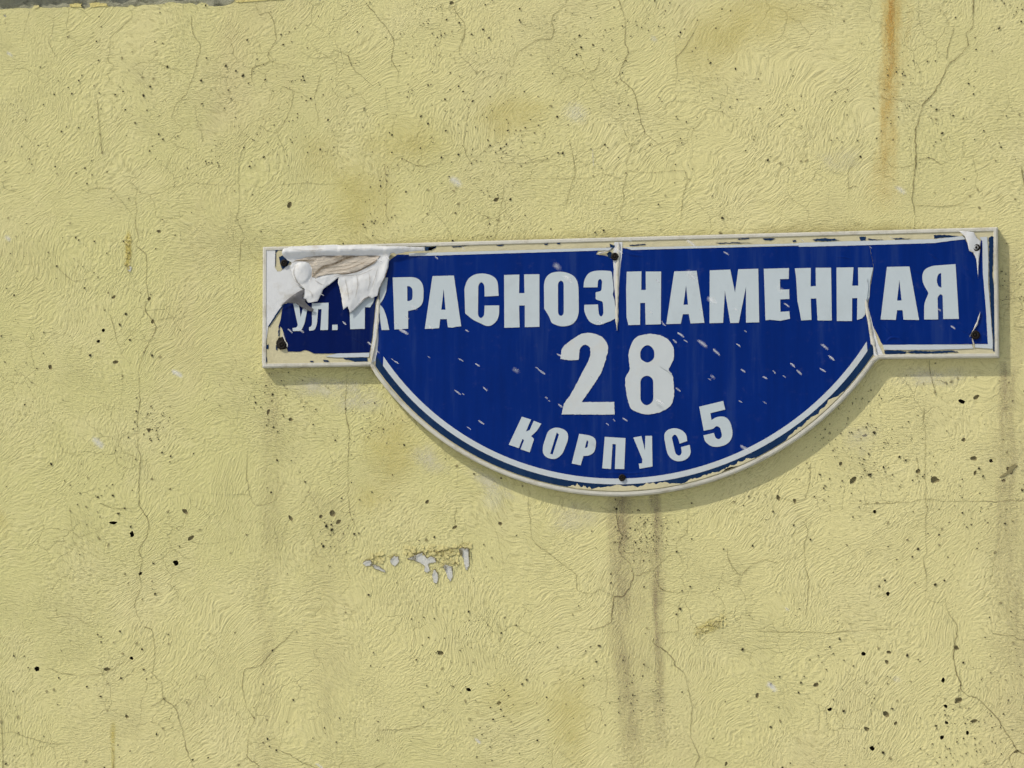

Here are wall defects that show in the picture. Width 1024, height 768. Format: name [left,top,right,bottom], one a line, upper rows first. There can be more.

crack [910,37,969,207]
flaking render [363,539,472,584]
crack [953,634,1023,754]